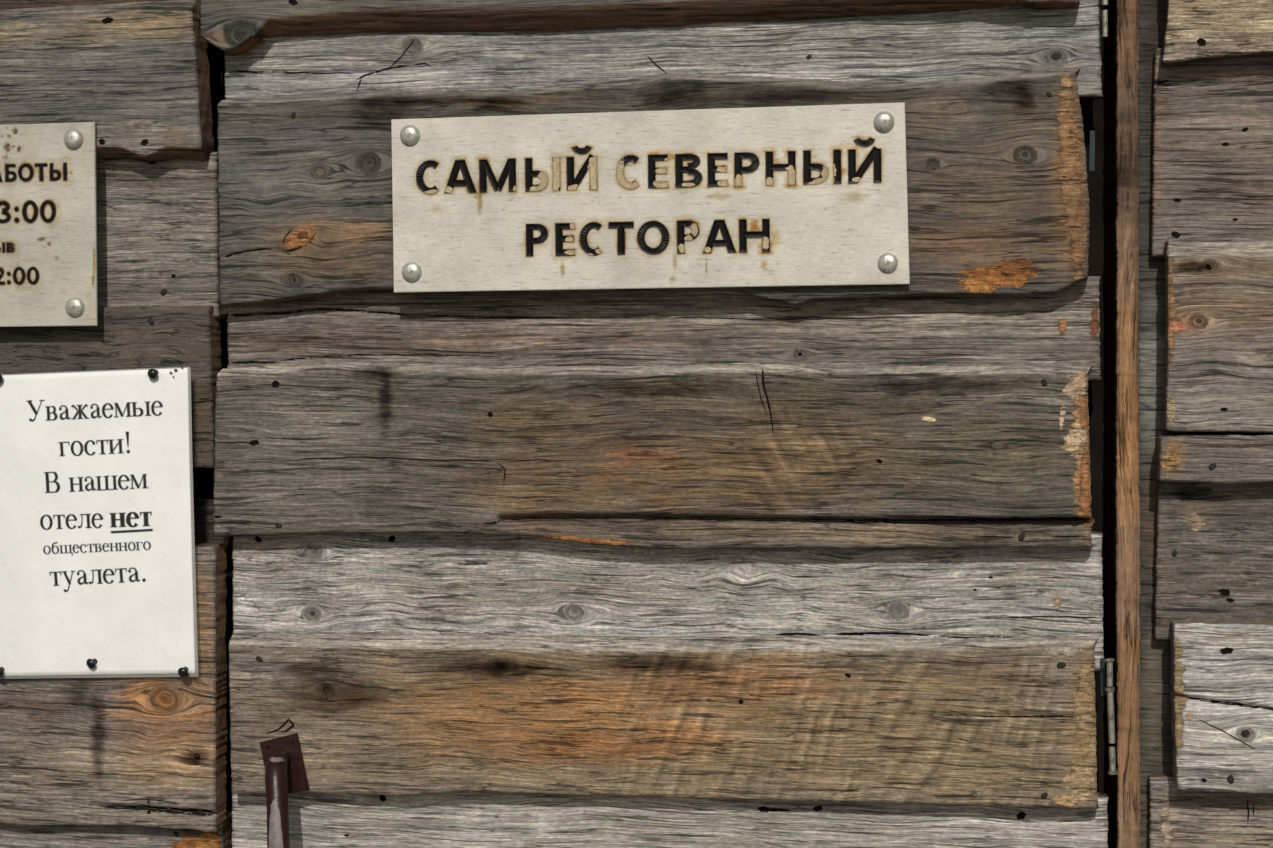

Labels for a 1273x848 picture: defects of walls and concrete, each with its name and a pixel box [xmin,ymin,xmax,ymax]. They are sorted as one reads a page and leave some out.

crack [229,36,430,89]
peeling [959,257,1037,294]
peeling [1059,368,1091,527]
crack [485,516,1096,538]